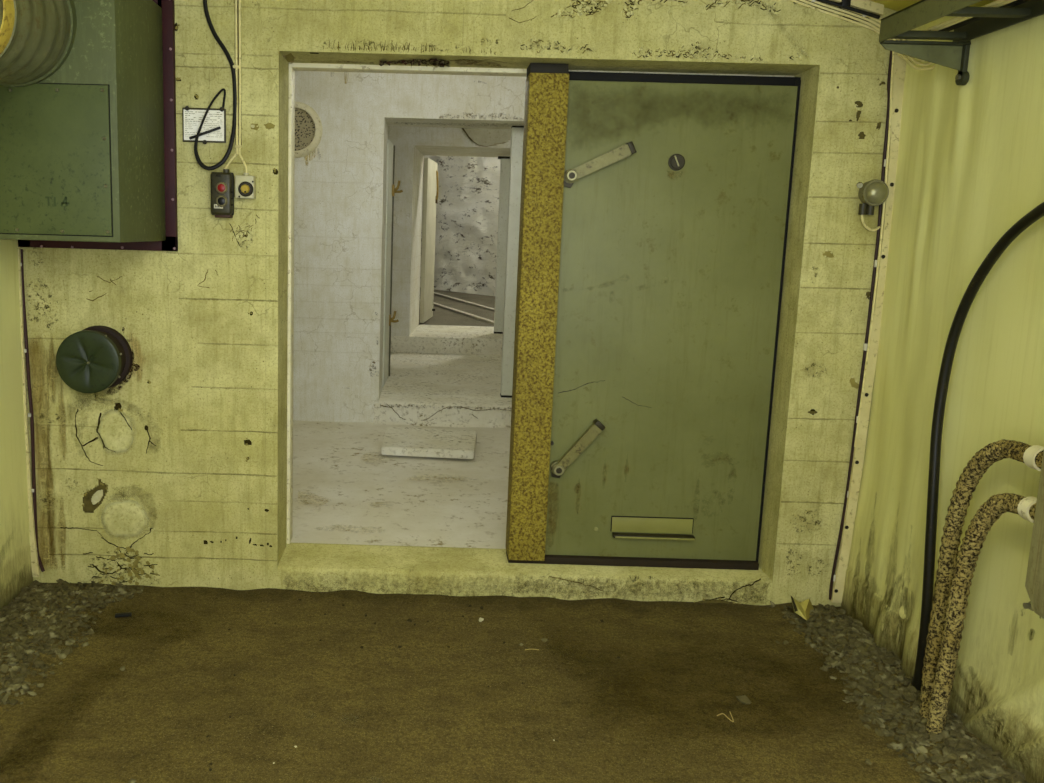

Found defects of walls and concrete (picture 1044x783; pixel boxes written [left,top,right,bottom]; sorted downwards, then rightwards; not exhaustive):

damp [30,348,65,565]
crack [75,409,156,466]
spalling [82,478,109,513]
crack [60,527,151,574]
crack [711,578,761,602]